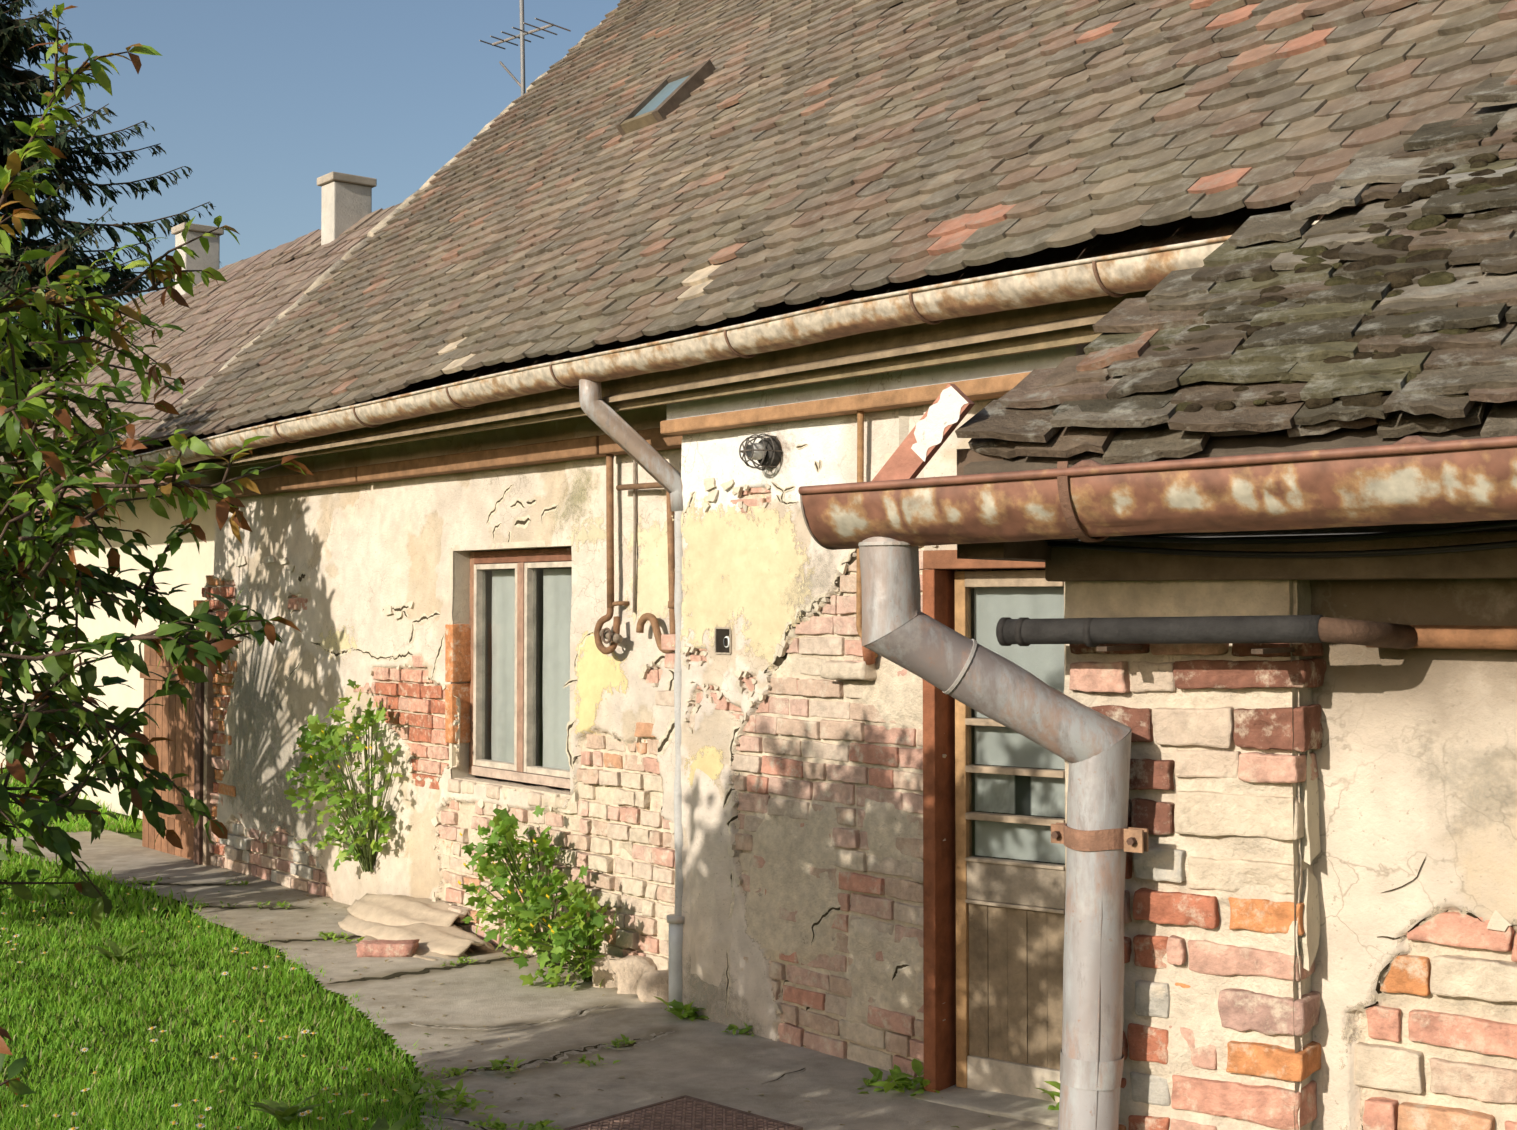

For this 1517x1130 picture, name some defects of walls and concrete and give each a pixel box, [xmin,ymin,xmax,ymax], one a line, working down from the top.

flaking render [193,556,295,628]
crack [486,484,558,542]
flaking render [919,545,938,612]
flaking render [190,656,333,899]
flaking render [353,478,924,1079]
flaking render [1340,900,1517,1130]